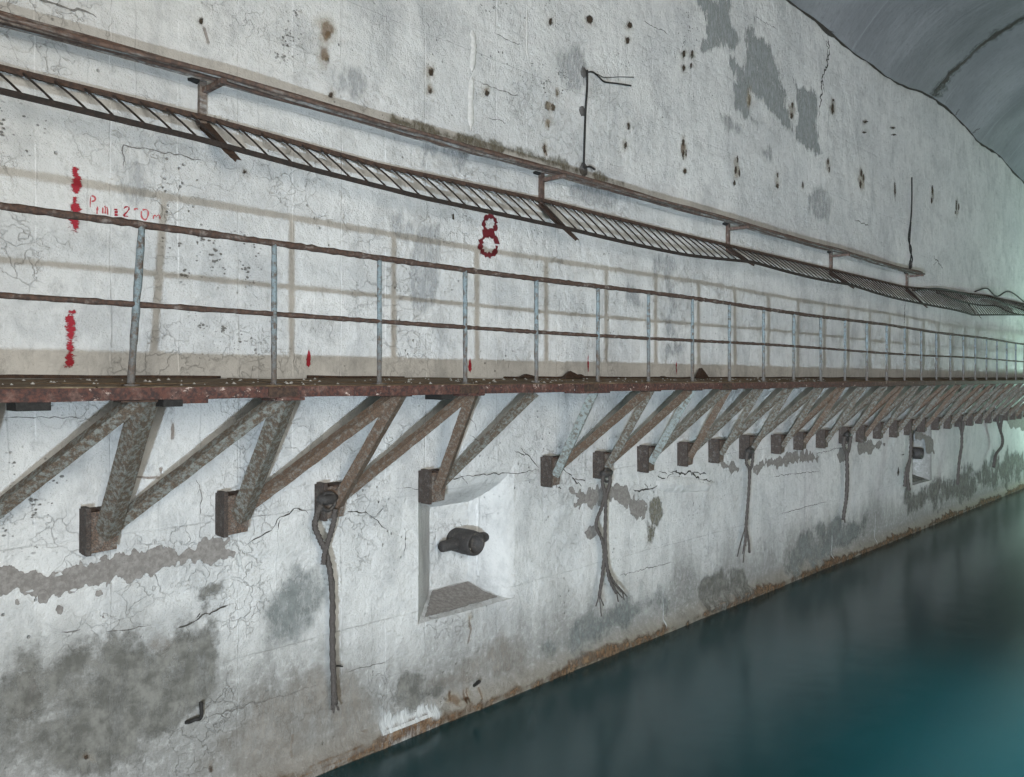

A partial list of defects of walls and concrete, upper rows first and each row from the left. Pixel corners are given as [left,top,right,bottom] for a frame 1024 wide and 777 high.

peeling [697,0,820,156]
crack [786,0,1024,184]
crack [245,508,308,546]
crack [348,510,406,551]
spalling [584,525,597,540]
spalling [569,483,647,520]
crack [633,470,712,492]
leakage [699,447,1024,617]
spalling [0,535,236,614]
crack [176,604,230,650]
leakage [0,620,218,775]
leakage [238,582,668,777]